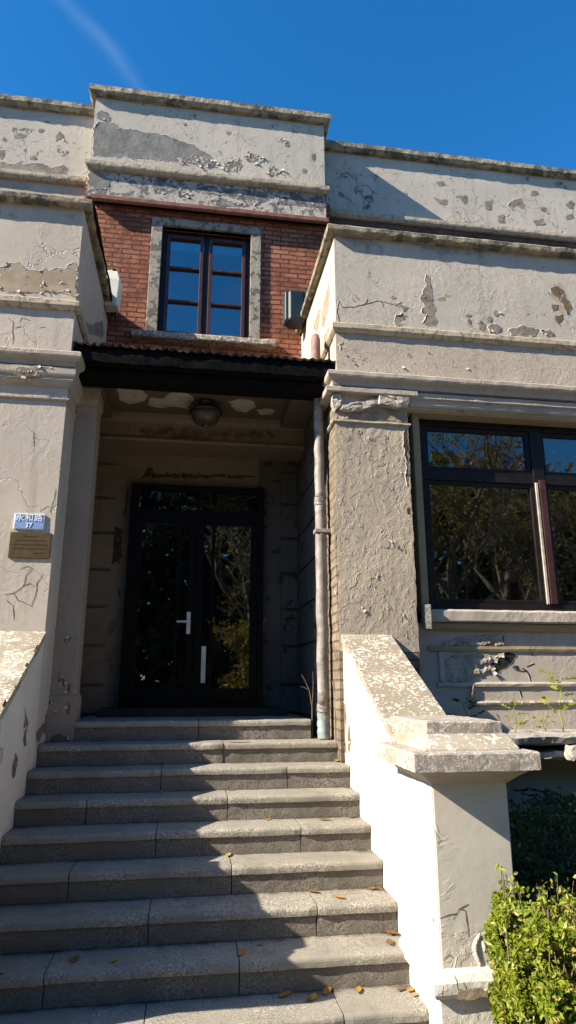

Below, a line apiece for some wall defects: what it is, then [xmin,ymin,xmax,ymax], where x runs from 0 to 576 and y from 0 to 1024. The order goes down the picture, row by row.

peeling [0,127,69,175]
peeling [92,110,284,176]
peeling [150,177,326,207]
peeling [485,177,547,225]
peeling [0,261,78,297]
crack [336,299,409,321]
peeling [391,274,438,327]
peeling [465,285,572,338]
peeling [116,389,195,409]
crack [7,566,43,617]
peeling [441,633,519,683]
peeling [12,672,71,779]